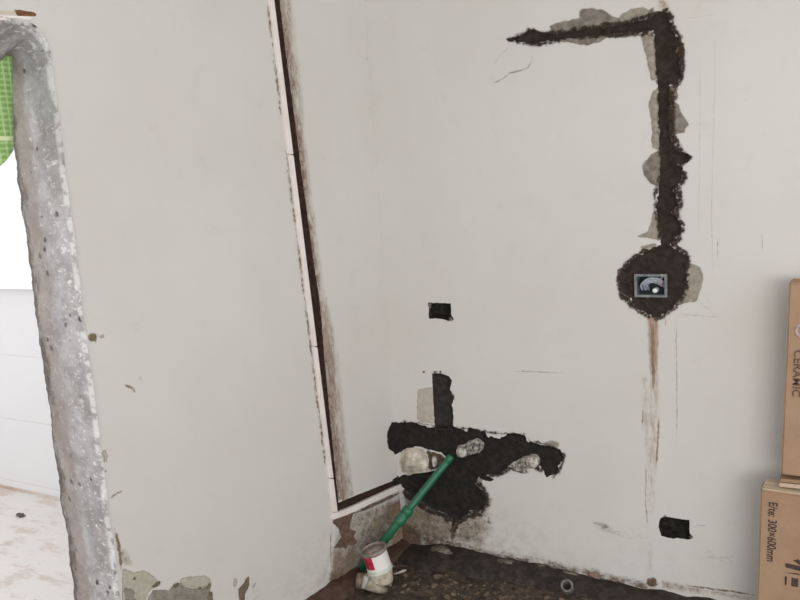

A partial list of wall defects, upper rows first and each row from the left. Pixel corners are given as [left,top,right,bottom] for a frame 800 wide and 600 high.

spalling [617,243,703,321]
rust [649,319,657,389]
spalling [387,421,566,532]
peeling [122,570,213,600]
peeling [234,577,249,600]
peeling [330,512,357,580]
water stain [338,502,529,576]
water stain [539,562,668,589]